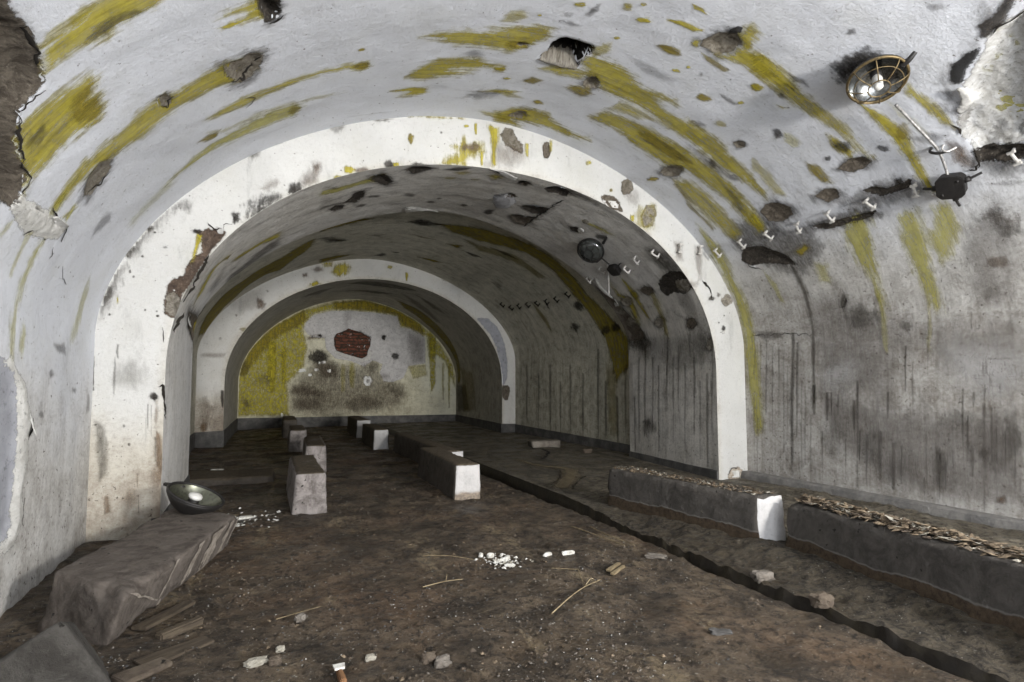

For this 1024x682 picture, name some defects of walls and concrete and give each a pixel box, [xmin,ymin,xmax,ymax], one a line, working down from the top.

flaking render [0,0,69,242]
water stain [72,85,103,121]
flaking render [538,37,595,70]
water stain [640,133,692,163]
flaking render [700,26,743,56]
flaking render [948,0,1024,171]
flaking render [736,178,921,270]
flaking render [162,224,226,341]
flaking render [594,251,699,350]
flaking render [296,329,372,376]
water stain [267,341,401,410]
water stain [793,268,1013,503]